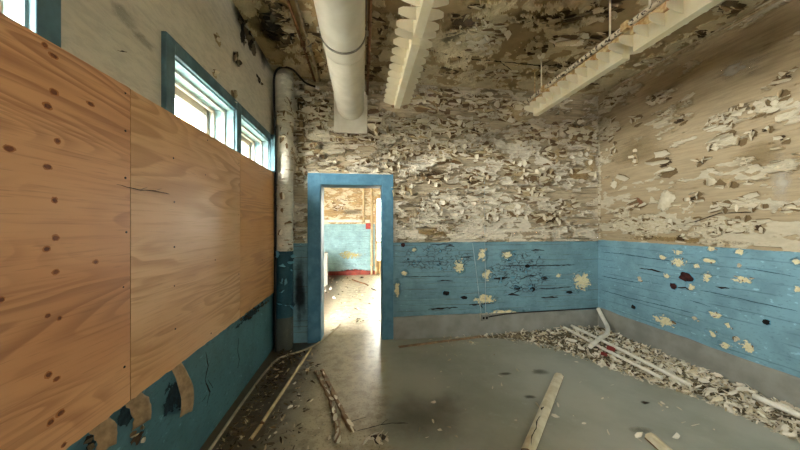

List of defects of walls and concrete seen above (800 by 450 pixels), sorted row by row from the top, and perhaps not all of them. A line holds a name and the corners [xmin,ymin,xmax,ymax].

peeling [709,0,747,19]
peeling [517,0,625,79]
peeling [273,66,800,284]
damp [295,264,305,319]
crack [403,243,473,281]
peeling [474,294,516,315]
crack [428,249,572,310]
peeling [573,272,591,291]
peeling [653,315,676,328]
peeling [708,311,754,355]
peeling [164,362,194,418]
peeling [83,392,152,450]